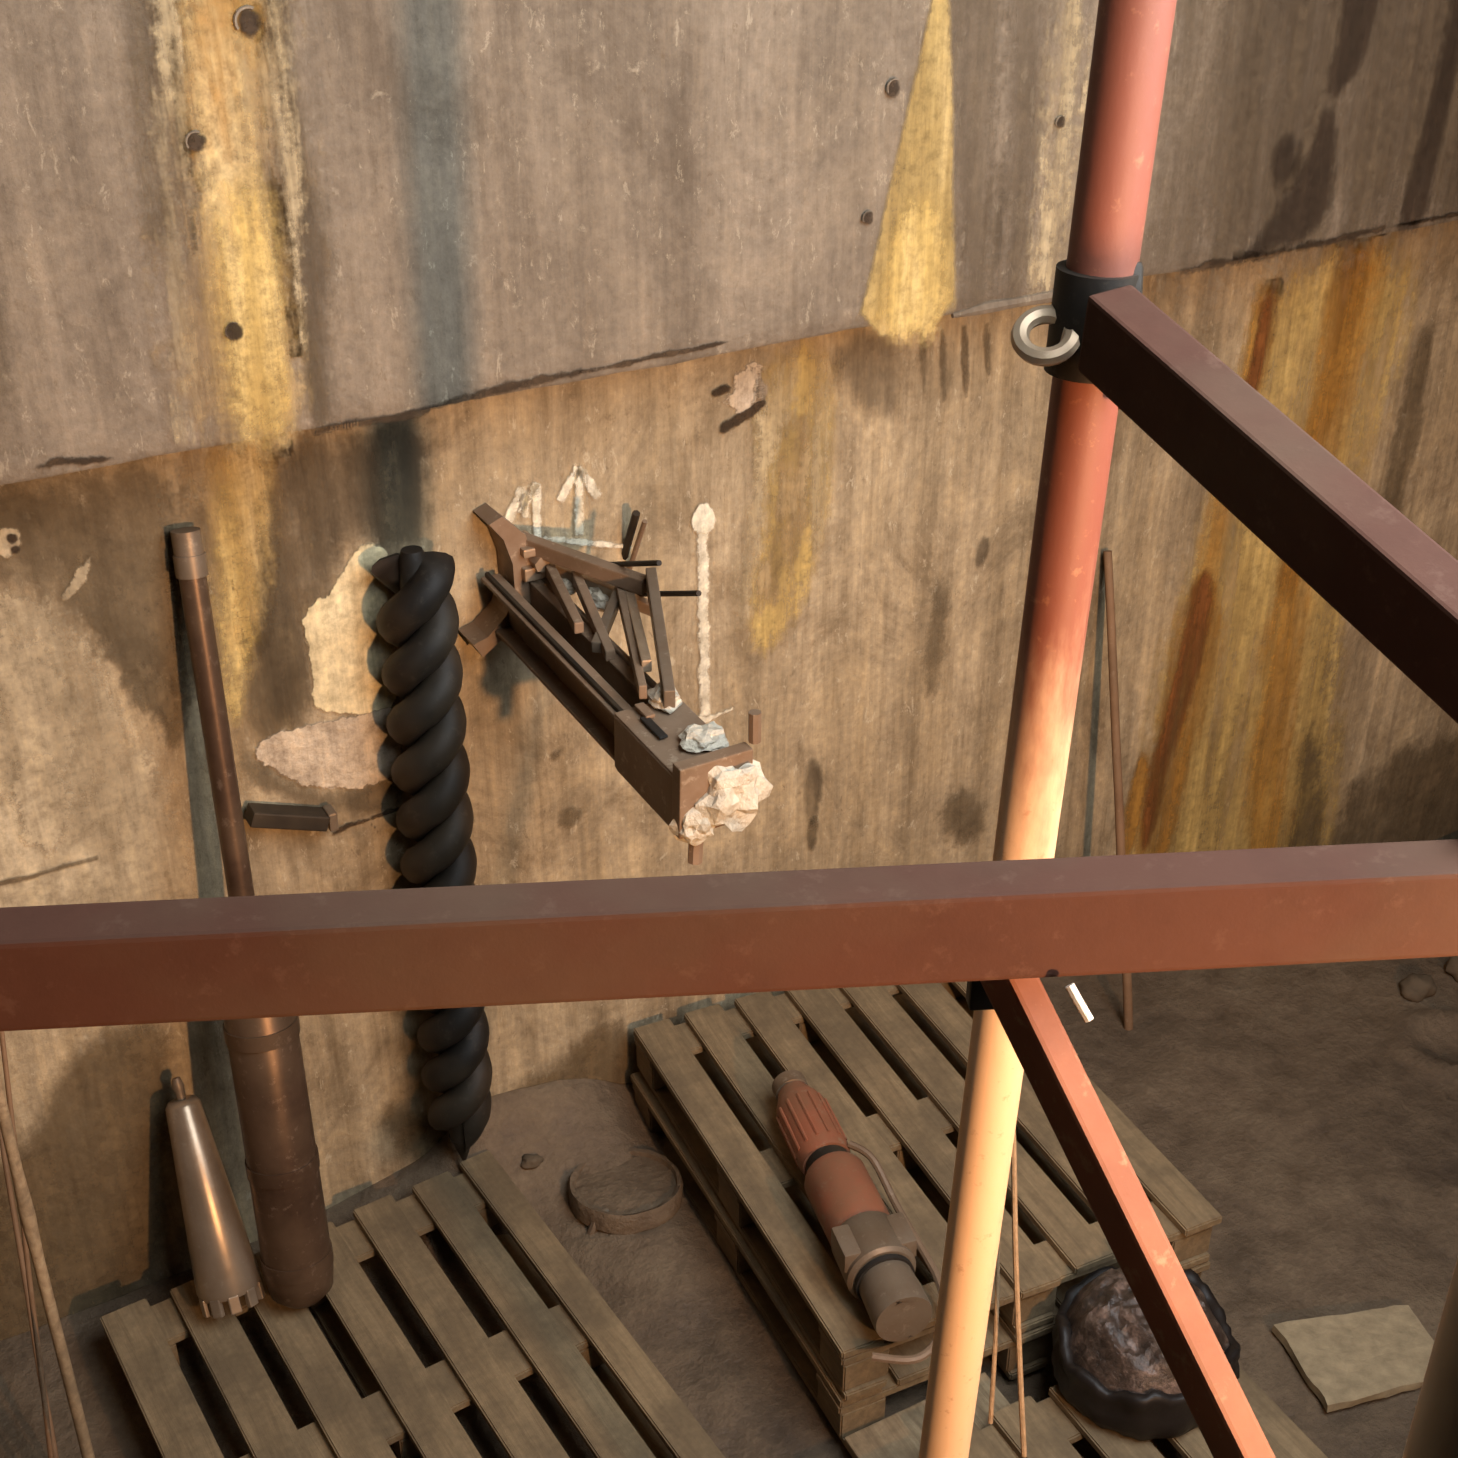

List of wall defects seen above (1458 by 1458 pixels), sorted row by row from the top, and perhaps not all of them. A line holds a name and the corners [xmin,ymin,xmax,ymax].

corrosion [156,0,311,569]
spalling [712,362,768,433]
corrosion [862,0,954,339]
leakage [1249,0,1377,256]
corrosion [1244,244,1410,466]
leakage [1355,0,1458,232]
leakage [0,426,421,777]
peeling [247,543,402,812]
corrosion [1125,497,1341,855]